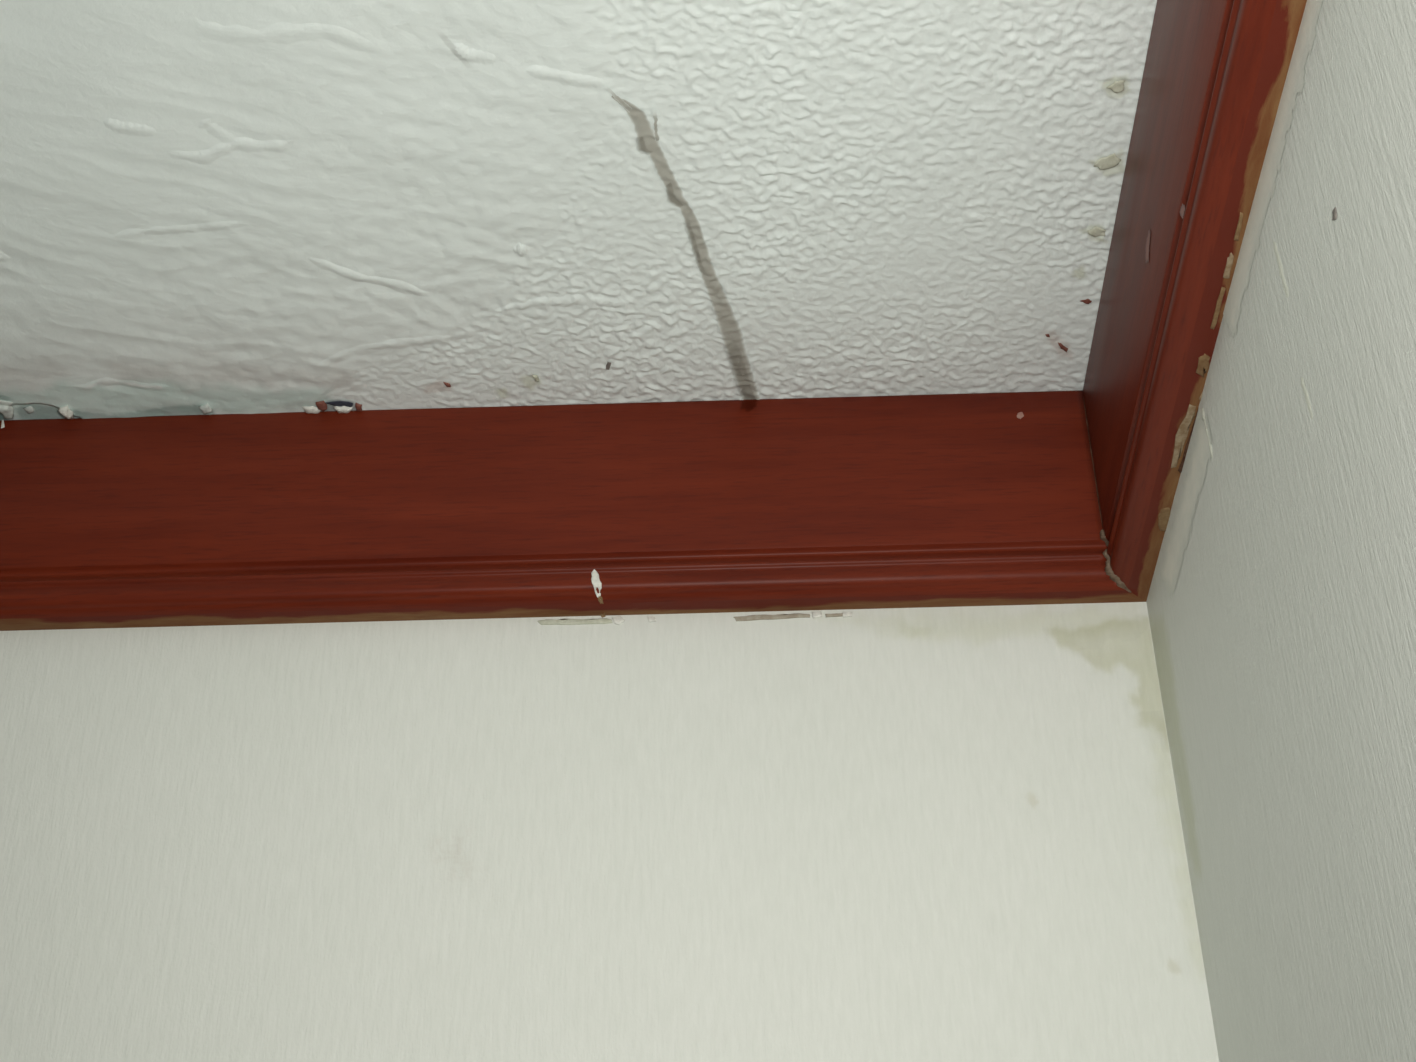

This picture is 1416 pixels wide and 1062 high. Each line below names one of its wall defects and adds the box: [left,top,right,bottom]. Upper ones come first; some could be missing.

flaking render [303,401,362,414]